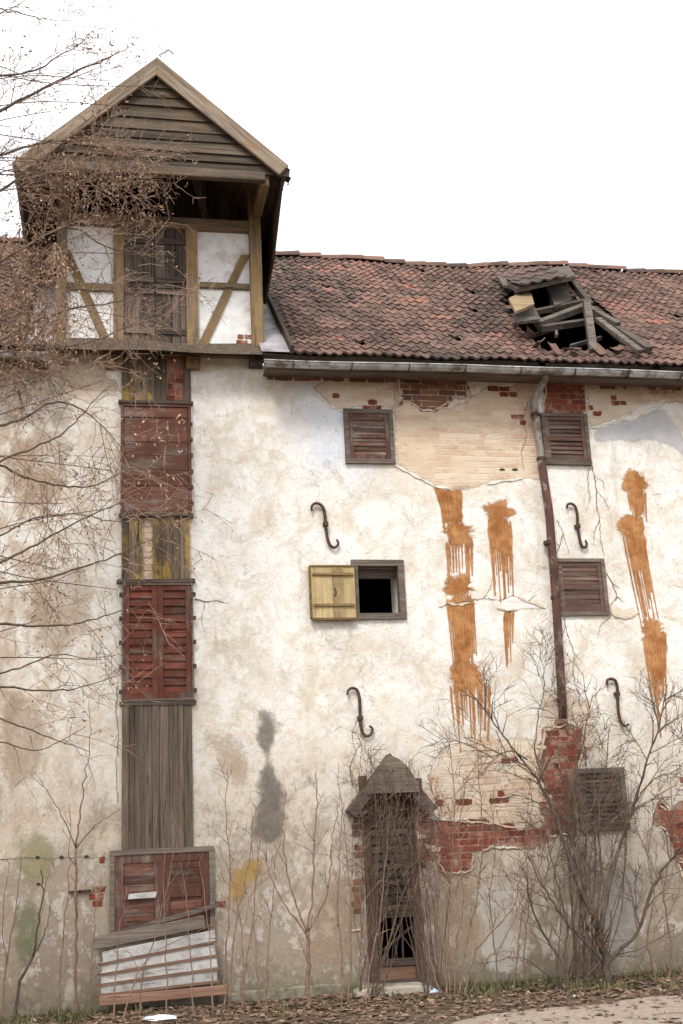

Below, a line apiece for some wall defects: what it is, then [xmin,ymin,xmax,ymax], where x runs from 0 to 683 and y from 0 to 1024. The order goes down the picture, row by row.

flaking render [267,376,683,490]
rust [434,487,491,753]
rust [481,499,516,666]
crack [587,466,623,634]
rust [616,469,668,737]
leakage [253,712,285,842]
flaking render [416,688,597,878]
flaking render [653,777,683,879]